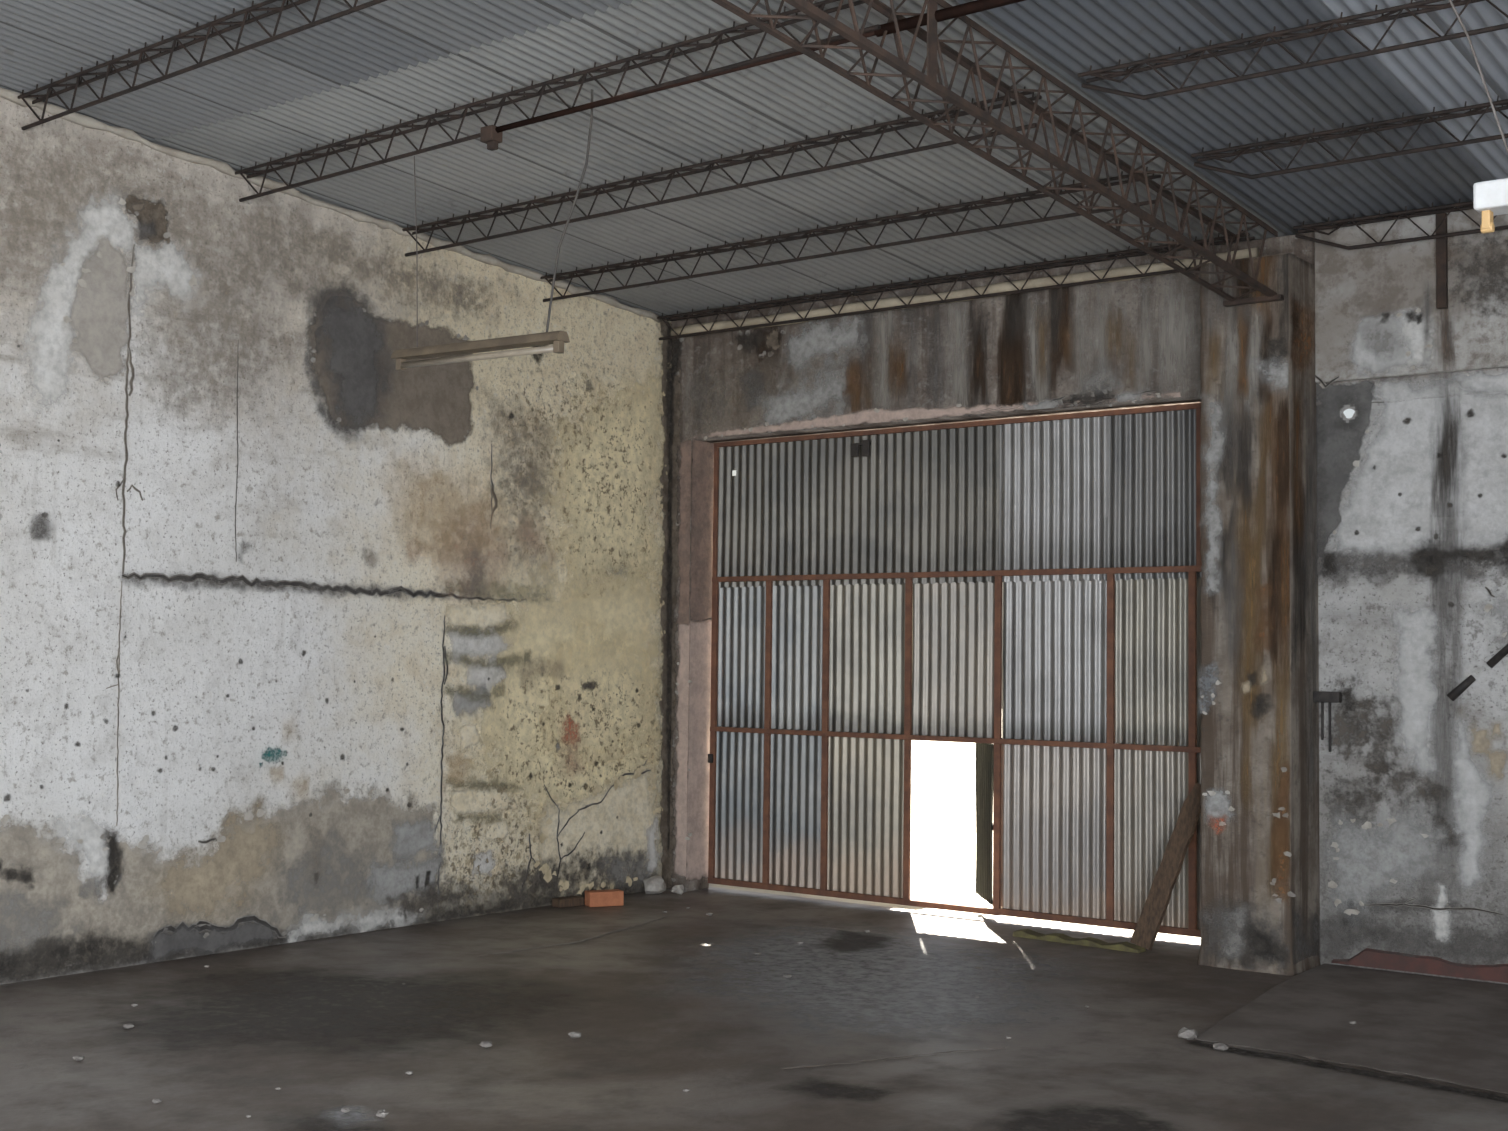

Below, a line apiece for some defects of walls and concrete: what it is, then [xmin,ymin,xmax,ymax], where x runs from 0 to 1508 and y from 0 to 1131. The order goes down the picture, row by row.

peeling [17,195,201,405]
spalling [308,289,478,446]
damp [31,516,49,539]
crack [106,244,550,912]
damp [131,378,664,828]
damp [934,254,1508,969]
corrosion [1237,390,1290,886]
peeling [56,802,122,891]
spalling [151,919,287,960]
damp [0,784,658,982]
damp [136,972,563,1050]
crack [521,759,651,889]